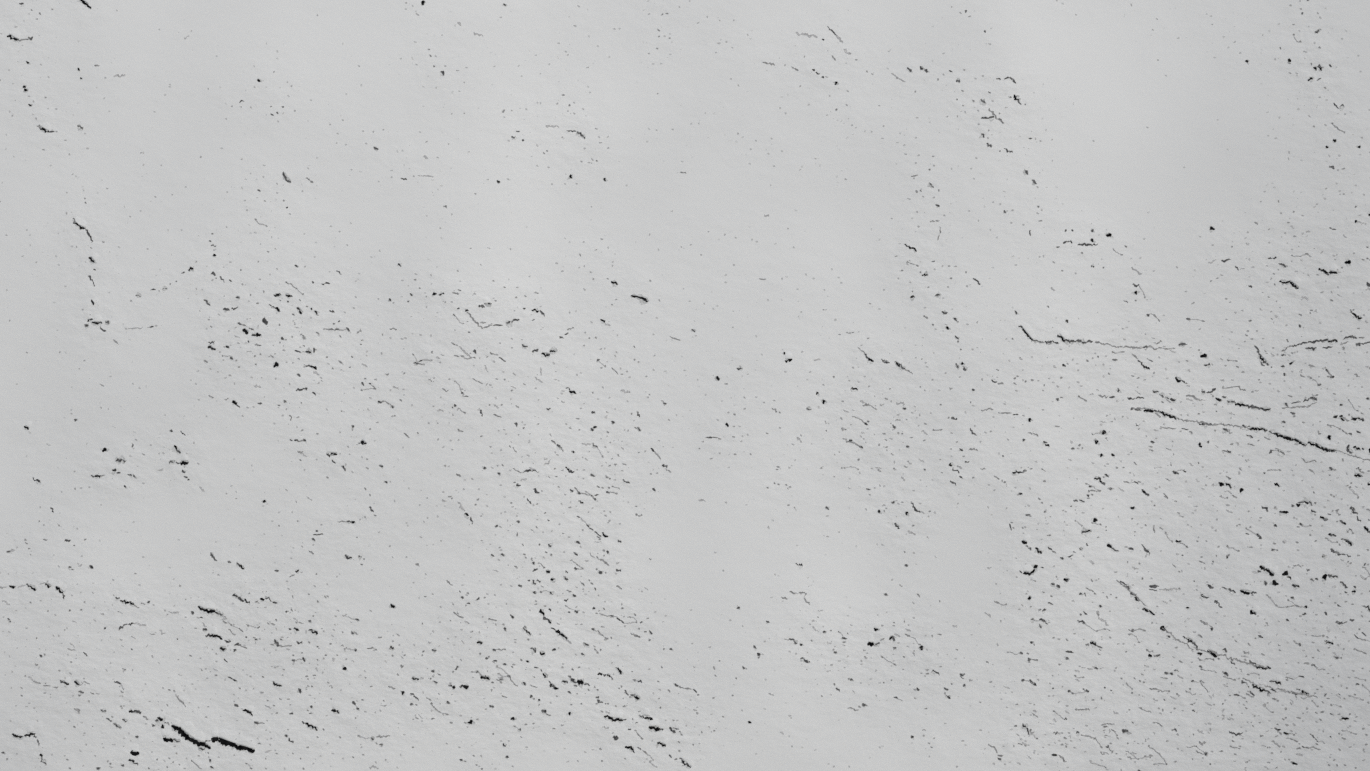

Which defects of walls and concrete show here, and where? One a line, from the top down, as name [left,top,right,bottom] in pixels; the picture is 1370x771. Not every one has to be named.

crack [1,29,33,43]
crack [1221,257,1370,366]
crack [1019,322,1370,698]
crack [28,676,265,769]